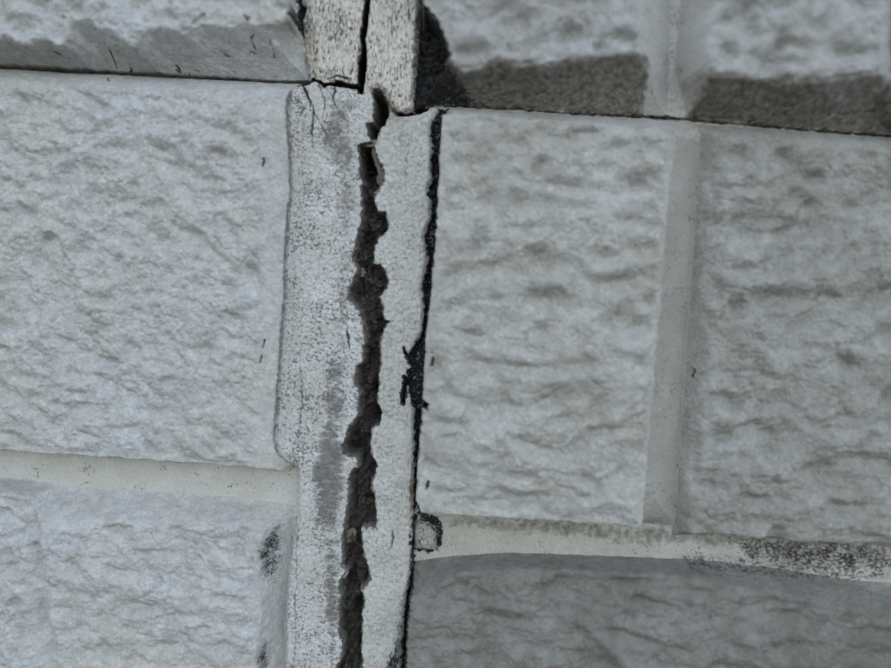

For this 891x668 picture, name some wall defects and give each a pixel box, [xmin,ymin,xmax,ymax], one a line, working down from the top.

crack [284,0,429,668]